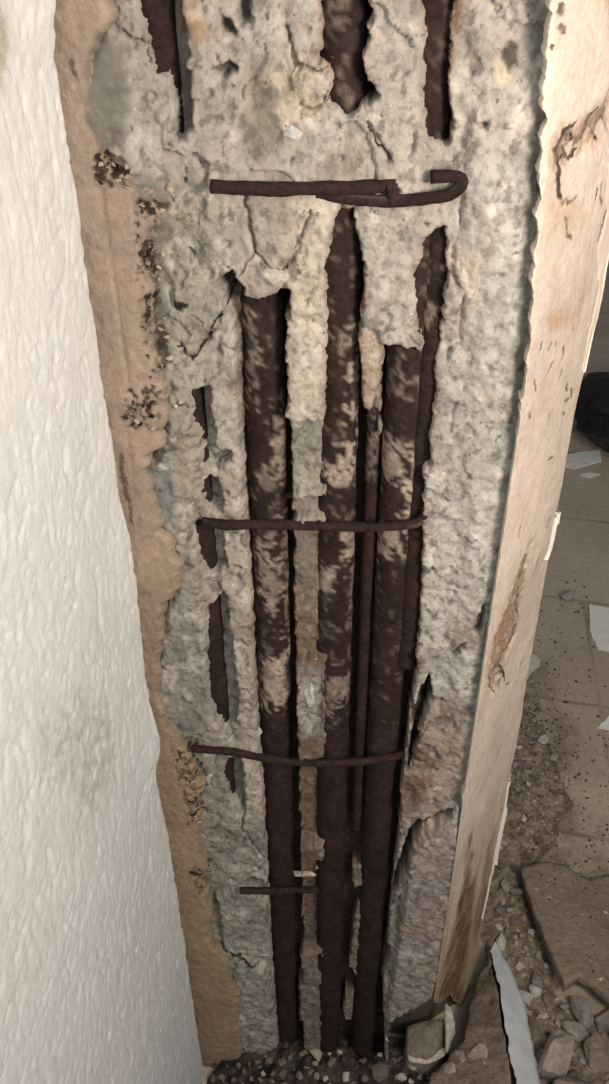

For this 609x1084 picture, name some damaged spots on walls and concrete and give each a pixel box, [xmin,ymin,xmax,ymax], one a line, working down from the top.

crack [553,101,605,205]
spalling [93,0,566,1062]
leakage [440,882,475,1002]